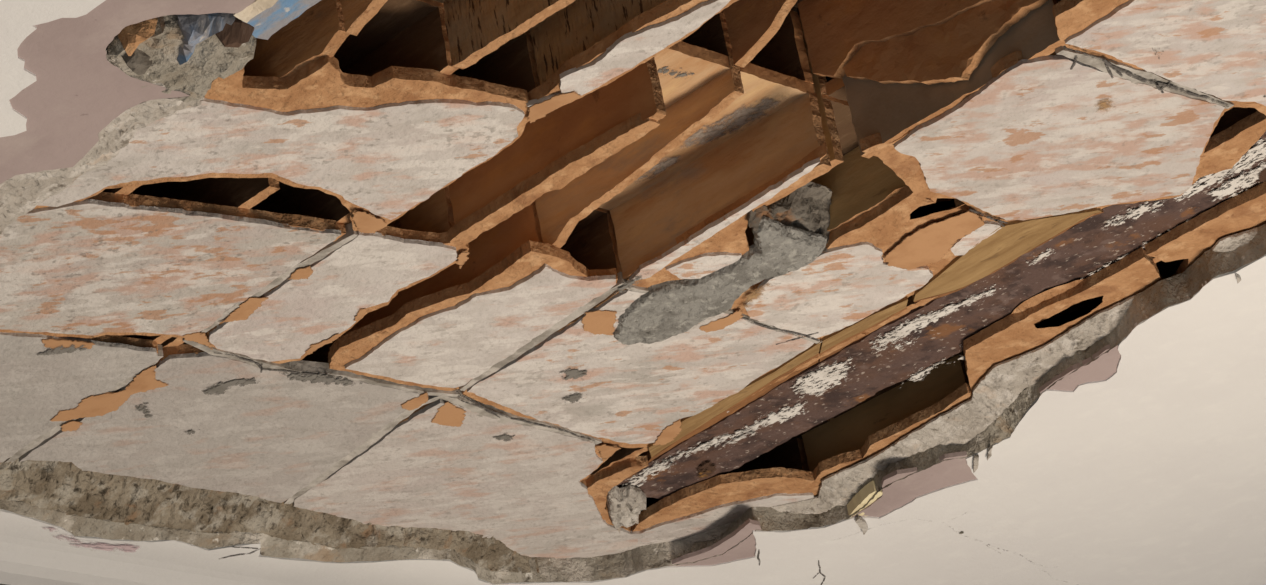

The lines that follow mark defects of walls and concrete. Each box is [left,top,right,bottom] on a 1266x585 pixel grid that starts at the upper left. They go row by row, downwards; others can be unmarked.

peeling [0,0,255,184]
spalling [527,91,581,123]
crack [1070,50,1229,107]
peeling [1104,137,1266,230]
spalling [352,210,387,233]
spalling [884,211,985,270]
crack [214,352,343,378]
flaking render [0,224,1266,584]